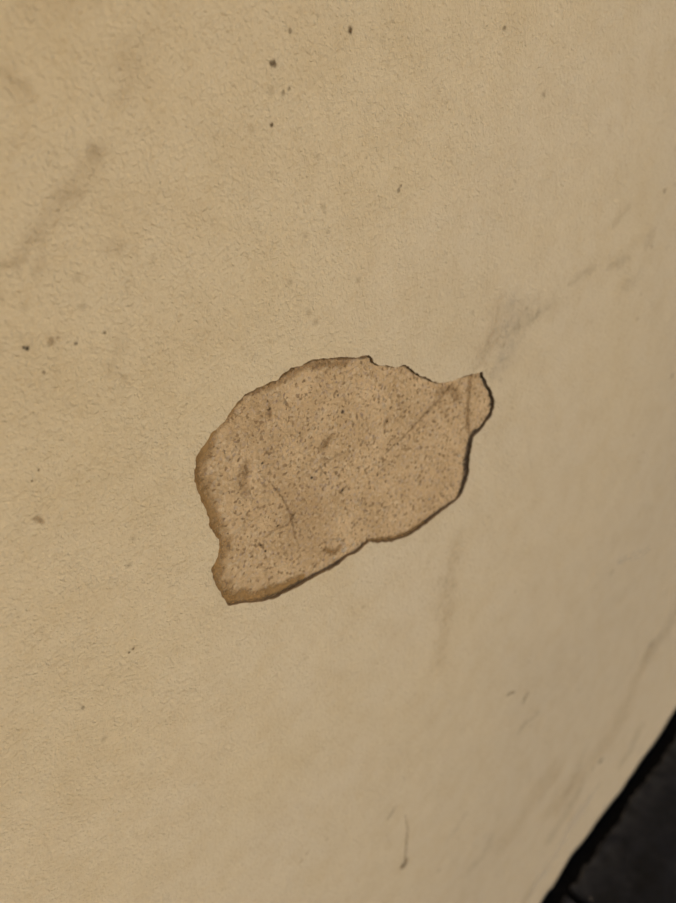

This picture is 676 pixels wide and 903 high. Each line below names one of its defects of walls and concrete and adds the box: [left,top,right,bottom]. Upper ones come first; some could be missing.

peeling [194,355,495,606]